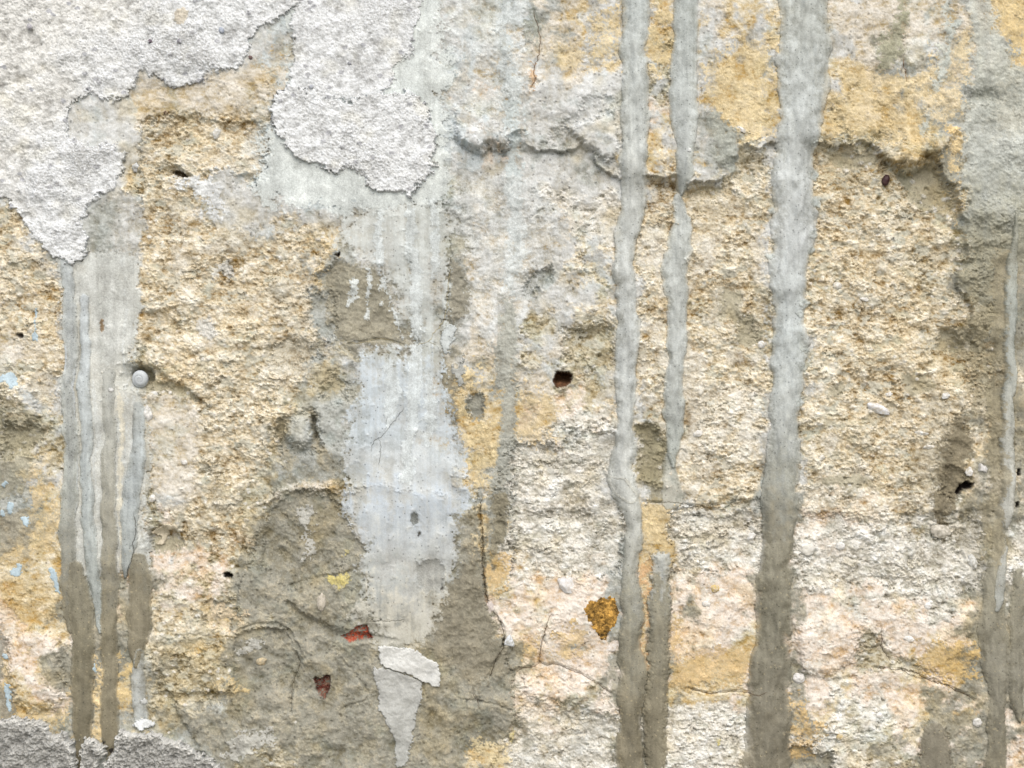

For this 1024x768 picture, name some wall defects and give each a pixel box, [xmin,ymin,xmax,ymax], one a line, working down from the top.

leakage [0,245,156,579]
spalling [0,0,439,566]
leakage [248,0,568,696]
crack [473,497,611,707]
leakage [633,420,667,505]
leakage [927,0,1024,569]